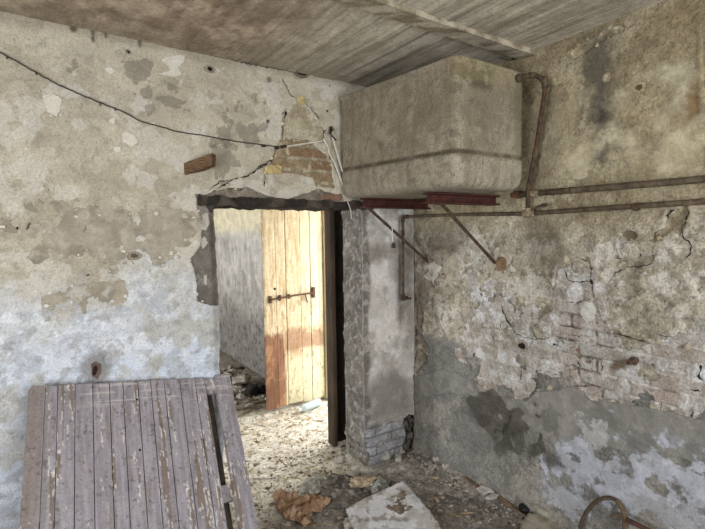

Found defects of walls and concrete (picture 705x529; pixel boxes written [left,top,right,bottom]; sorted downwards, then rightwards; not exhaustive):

crack [211,156,274,192]
crack [205,54,325,133]
flaking render [270,104,344,202]
damp [563,64,705,179]
peeling [0,214,19,233]
peeling [24,187,275,321]
crack [564,210,692,304]
crack [499,303,592,341]
flaking render [455,257,705,419]
flaking render [364,414,413,466]
damp [465,388,705,529]